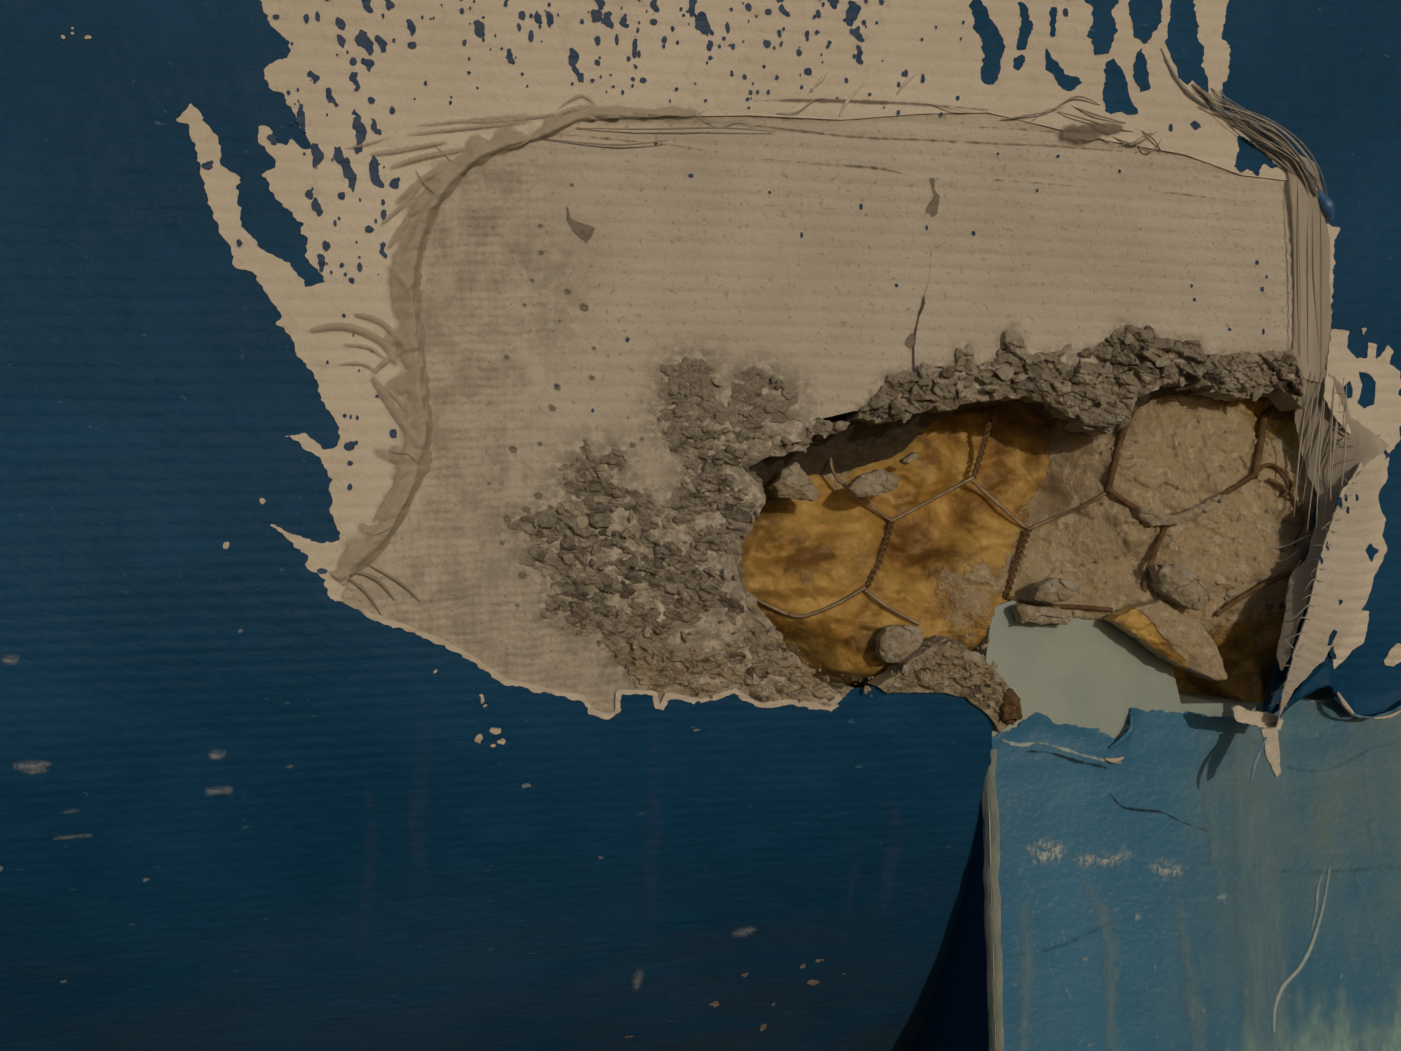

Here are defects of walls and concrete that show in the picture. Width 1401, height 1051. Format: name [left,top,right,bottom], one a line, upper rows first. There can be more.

flaking render [176,0,1307,768]
peeling [1383,643,1401,667]